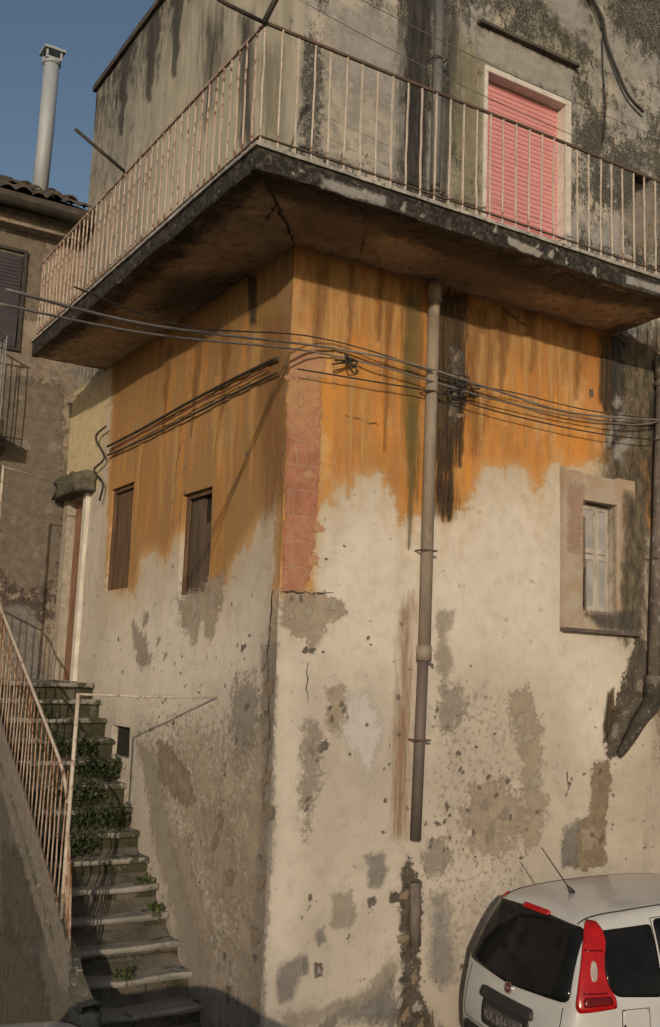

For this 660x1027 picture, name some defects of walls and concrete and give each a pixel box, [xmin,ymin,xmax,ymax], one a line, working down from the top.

damp [398,0,431,196]
damp [441,1,460,201]
crack [264,179,296,246]
spalling [279,347,348,654]
damp [39,170,660,525]
damp [328,267,422,548]
damp [2,605,44,680]
damp [0,836,44,949]
peeling [298,683,349,841]
peeling [367,685,550,1027]
spalling [562,636,648,872]